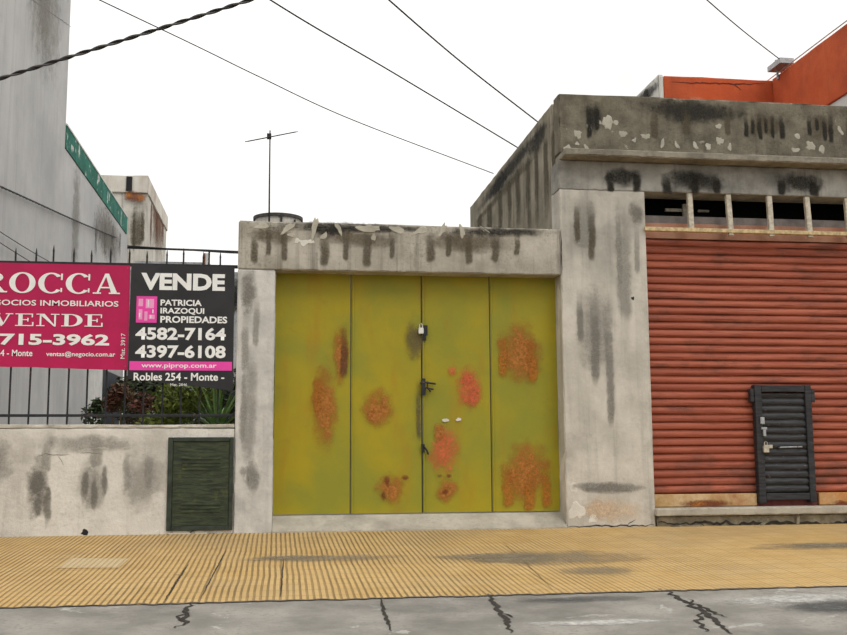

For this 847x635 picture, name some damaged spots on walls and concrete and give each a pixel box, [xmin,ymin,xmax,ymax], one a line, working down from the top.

peeling [599,115,650,142]
leakage [642,84,730,137]
peeling [693,124,731,151]
peeling [791,133,824,154]
leakage [427,124,555,263]
spalling [280,218,327,247]
leakage [251,222,415,265]
corrosion [334,336,348,376]
leakage [29,451,51,518]
corrosion [432,425,457,501]
corrosion [502,446,551,510]
crack [658,588,732,634]